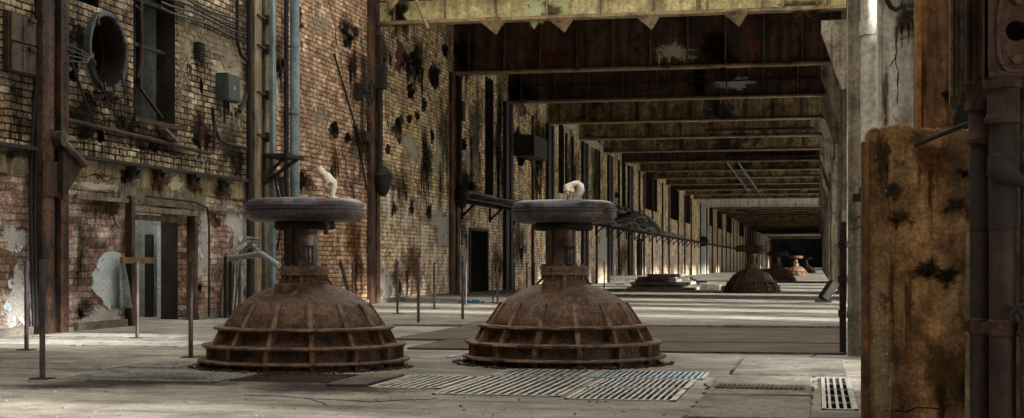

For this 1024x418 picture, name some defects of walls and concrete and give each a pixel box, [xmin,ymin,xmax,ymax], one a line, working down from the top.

peeling [300,11,354,49]
damp [406,62,424,102]
damp [657,43,695,65]
crack [890,32,899,105]
damp [391,130,447,225]
peeling [0,223,31,328]
peeling [78,251,121,322]